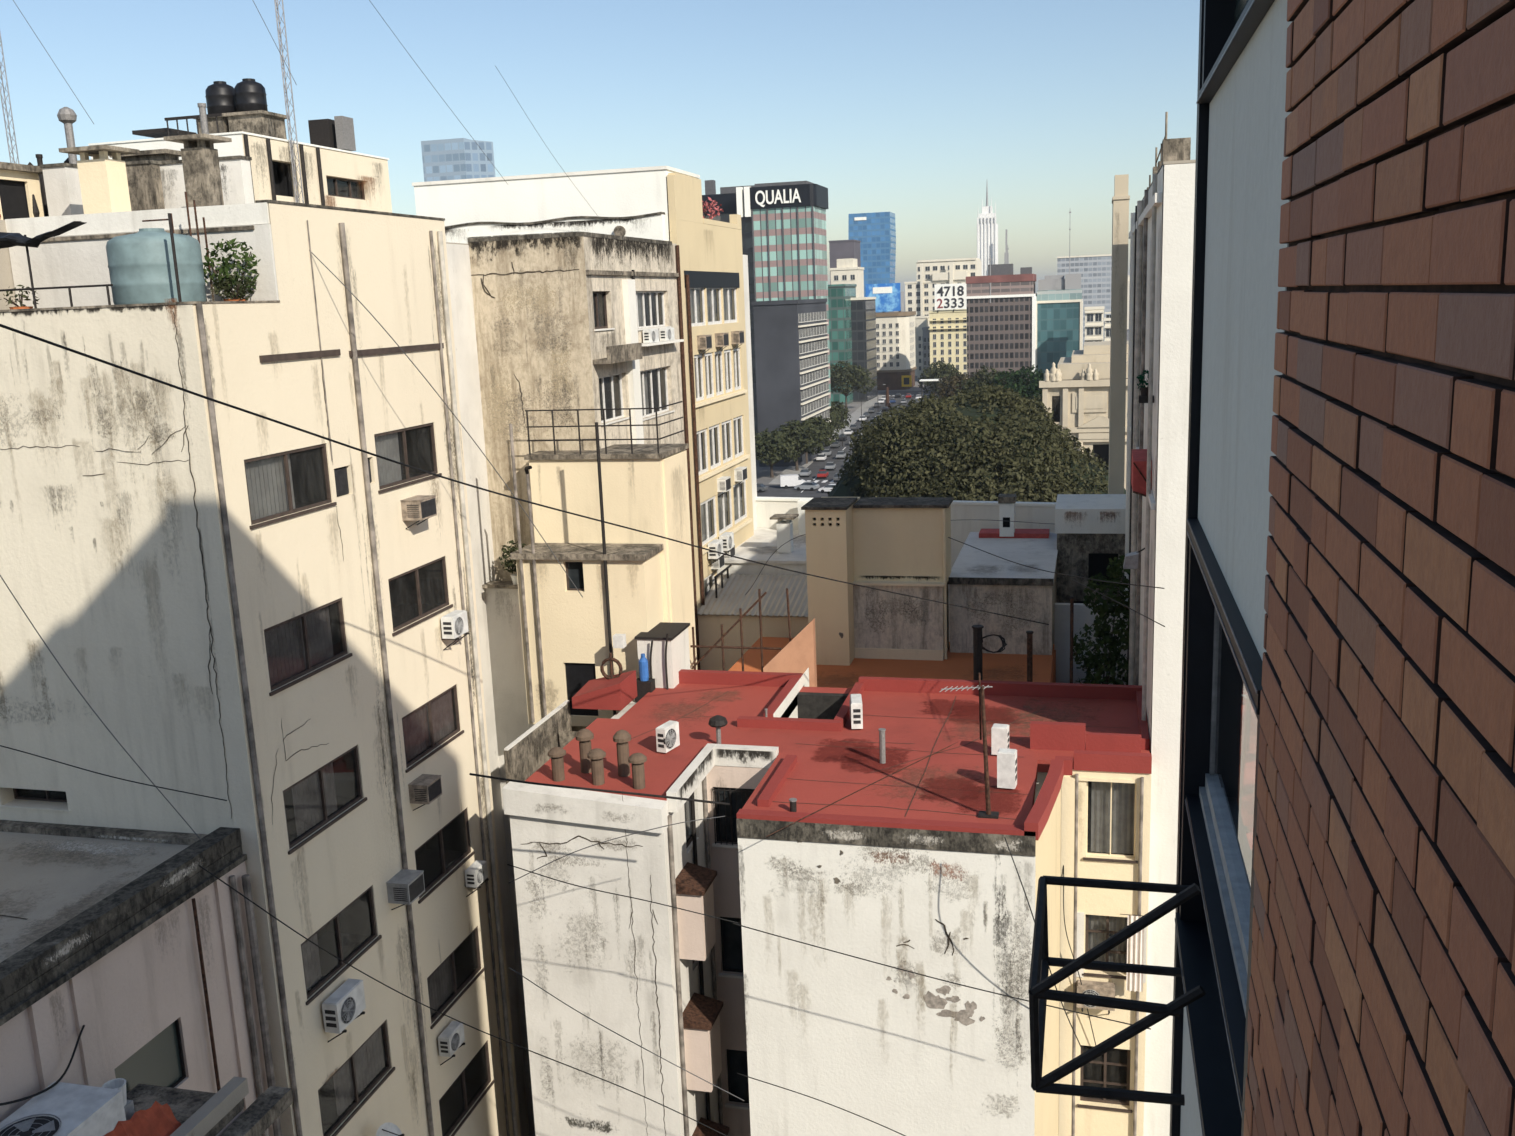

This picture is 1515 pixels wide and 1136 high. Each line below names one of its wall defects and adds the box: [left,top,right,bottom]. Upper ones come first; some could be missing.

damp [468,219,671,264]
damp [0,305,169,316]
damp [826,831,862,840]
crack [527,796,666,1135]
peeling [886,966,985,1026]
damp [566,1117,612,1133]